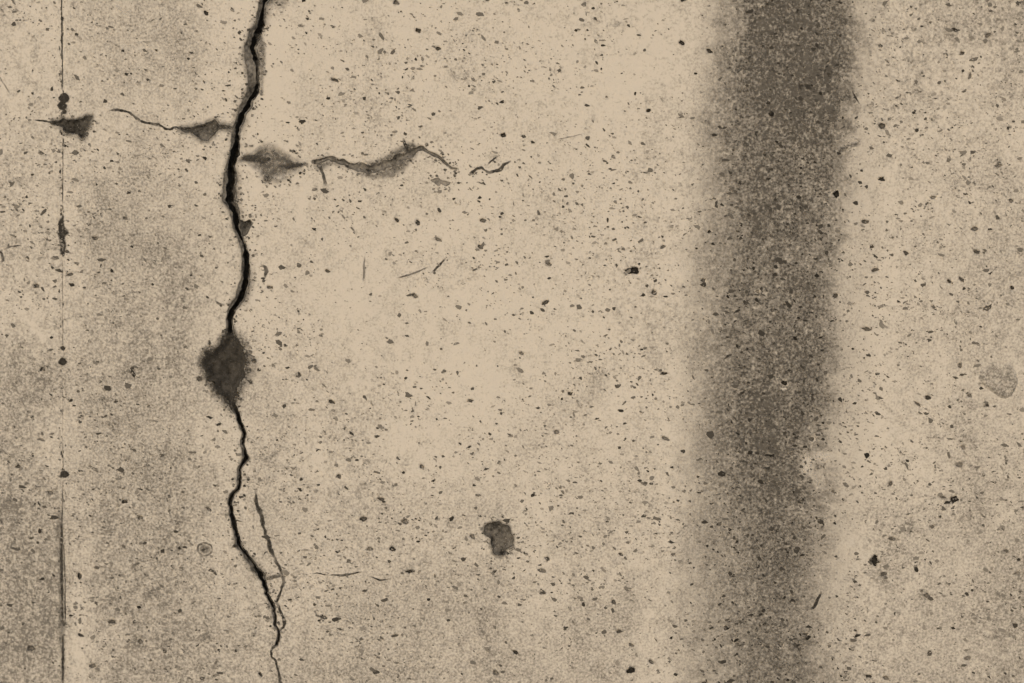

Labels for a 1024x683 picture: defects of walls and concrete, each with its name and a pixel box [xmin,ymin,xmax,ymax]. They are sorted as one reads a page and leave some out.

crack [111,0,271,339]
crack [314,140,509,186]
water stain [702,0,859,683]
crack [227,400,286,683]
crack [314,571,388,581]